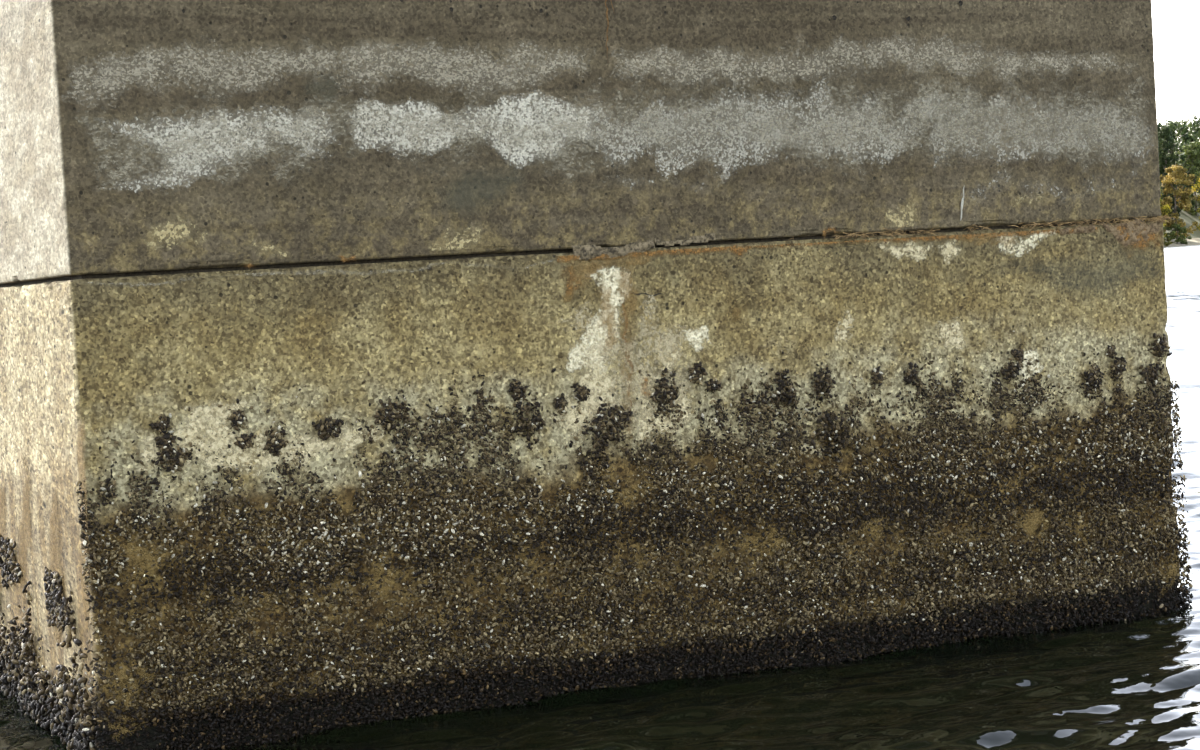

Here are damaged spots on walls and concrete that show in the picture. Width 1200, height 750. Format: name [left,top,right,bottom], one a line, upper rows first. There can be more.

damp [73,39,1116,192]
damp [555,266,711,443]
rust [557,228,1076,402]